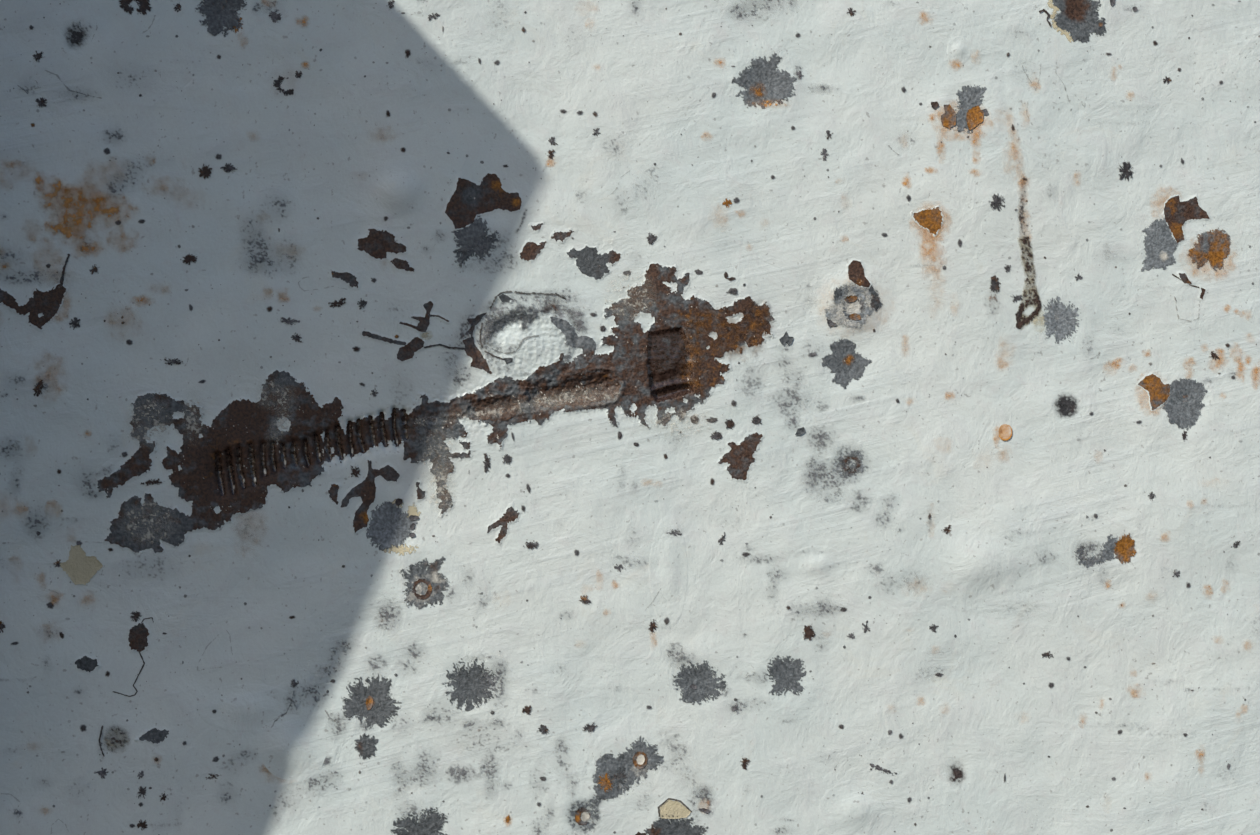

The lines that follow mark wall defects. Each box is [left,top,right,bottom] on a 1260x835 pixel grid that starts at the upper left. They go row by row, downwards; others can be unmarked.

peeling [1039,0,1115,43]
peeling [732,53,804,109]
peeling [441,165,641,284]
corrosion [990,194,1005,211]
corrosion [1013,178,1041,329]
peeling [1141,193,1230,302]
spalling [808,258,882,389]
peeling [1135,371,1207,440]
peeling [325,457,449,629]
peeling [1074,533,1136,568]
peeling [331,674,401,759]
peeling [568,736,663,832]